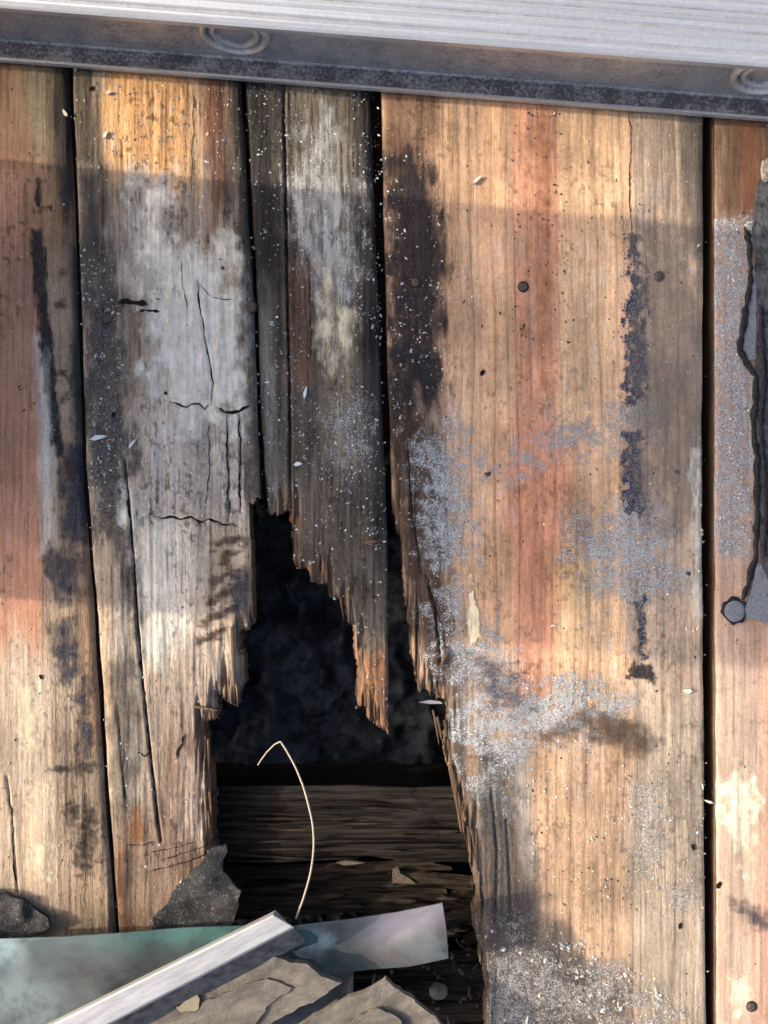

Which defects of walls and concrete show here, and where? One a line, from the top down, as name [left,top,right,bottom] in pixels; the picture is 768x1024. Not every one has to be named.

damp [30,98,371,774]
damp [307,144,455,685]
damp [611,227,701,524]
damp [64,803,101,877]
damp [108,657,136,810]
crack [115,269,249,873]
damp [463,644,538,720]
damp [471,776,593,1024]
damp [578,713,652,752]
damp [629,594,652,661]